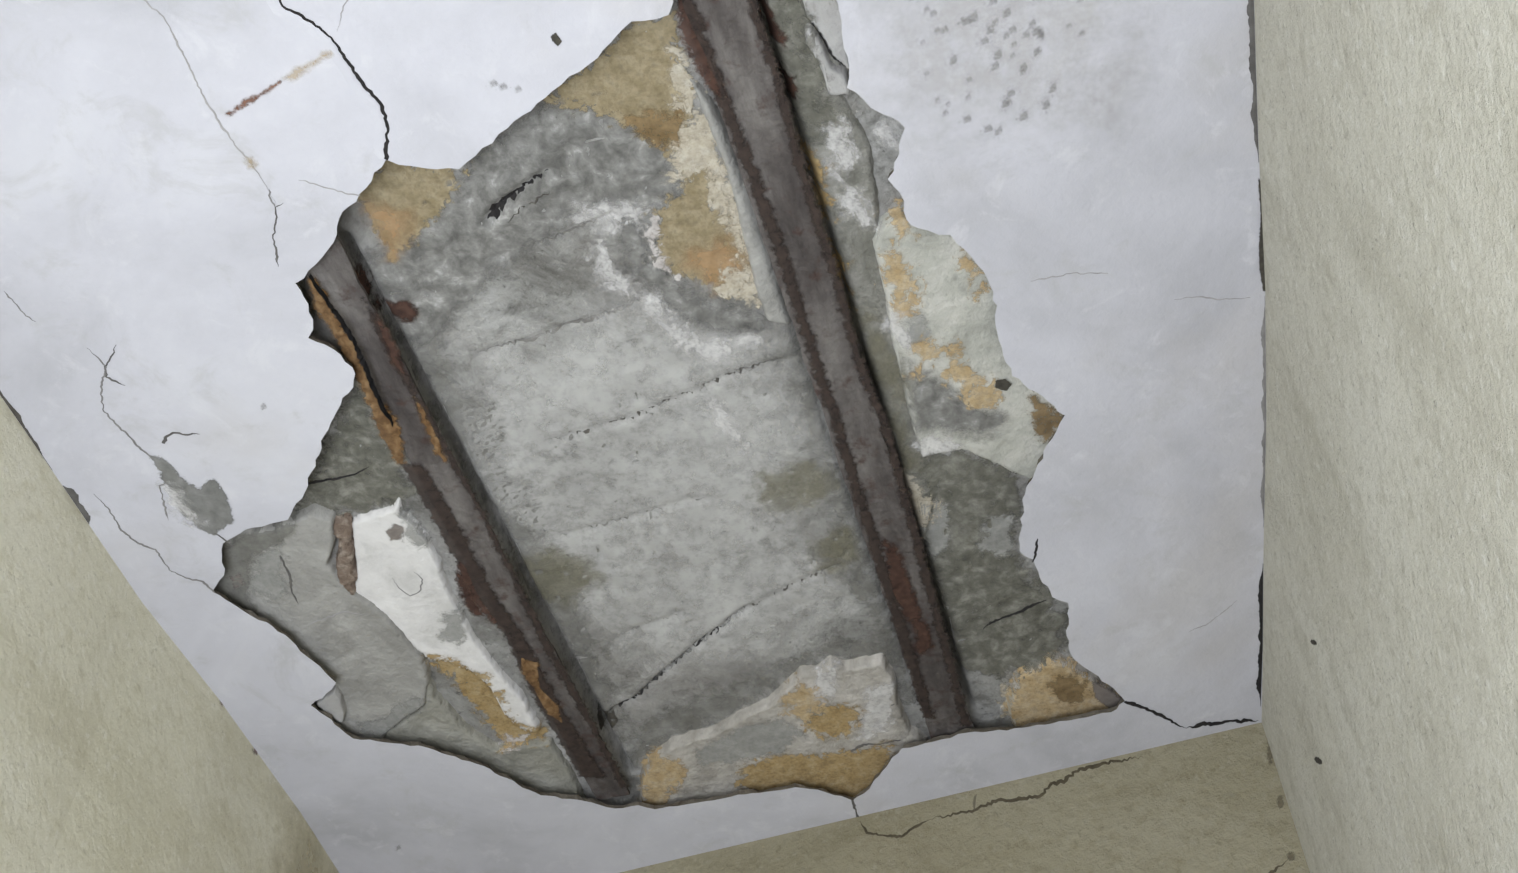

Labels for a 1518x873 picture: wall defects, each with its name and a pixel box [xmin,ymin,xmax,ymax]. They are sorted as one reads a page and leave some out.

crack [144,0,360,264]
crack [266,0,390,160]
crack [1247,0,1259,162]
spalling [150,0,931,805]
spalling [756,0,1122,728]
crack [1174,296,1266,527]
crack [1031,538,1039,562]
crack [1124,569,1263,728]
crack [851,756,1142,838]